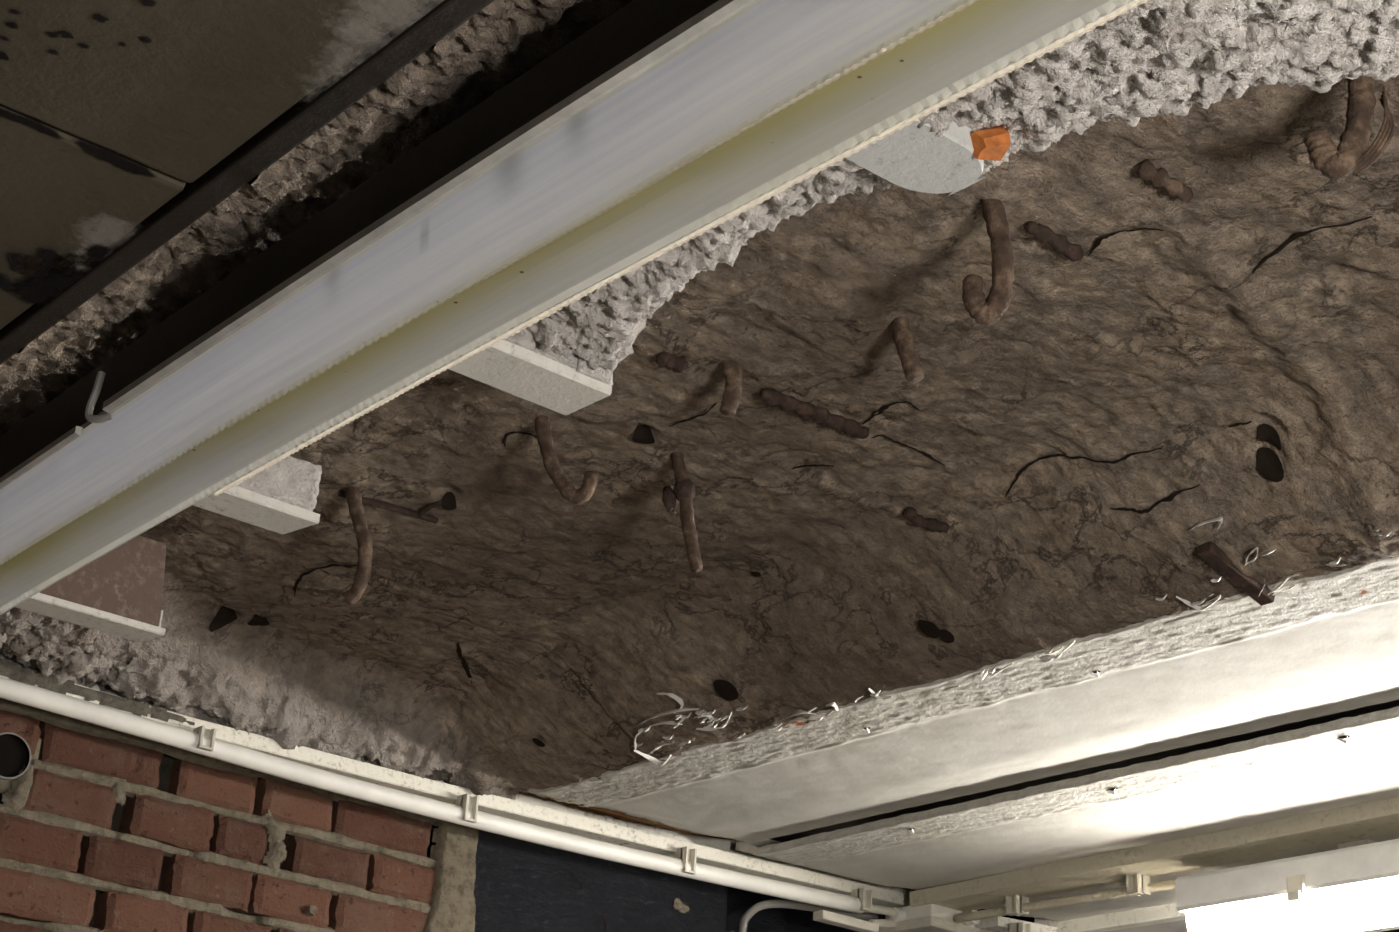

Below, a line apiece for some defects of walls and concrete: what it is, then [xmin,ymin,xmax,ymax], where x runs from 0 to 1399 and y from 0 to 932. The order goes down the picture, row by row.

rust [970,126,1011,161]
spalling [1304,76,1395,182]
spalling [962,199,1084,325]
crack [1088,228,1163,256]
crack [1252,216,1372,274]
crack [1229,420,1252,428]
crack [1005,447,1162,497]
crack [1110,484,1200,514]
peeling [1245,547,1276,566]
peeling [1155,577,1229,625]
peeling [632,692,748,766]
peeling [768,702,838,732]